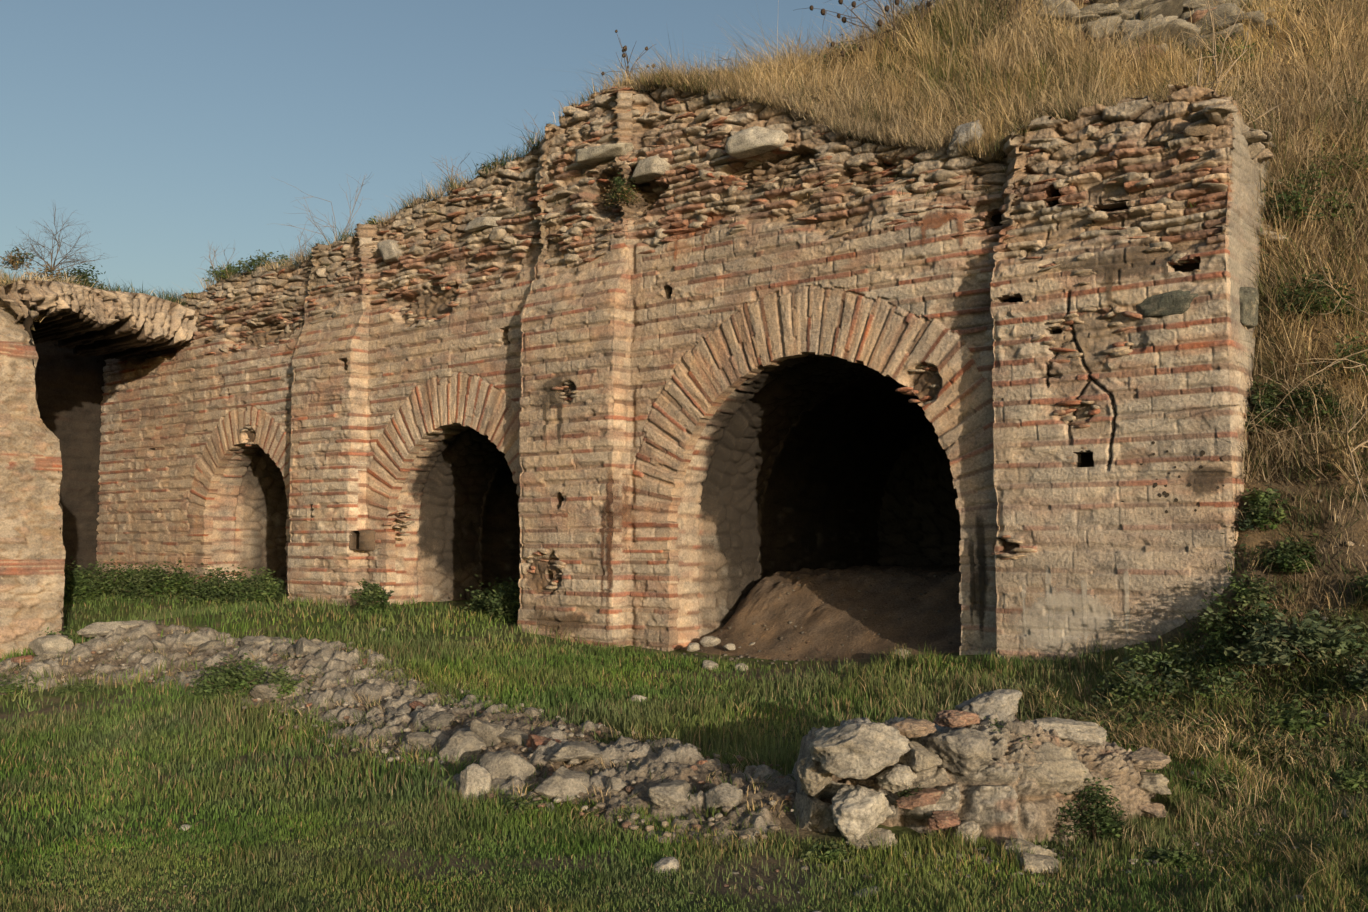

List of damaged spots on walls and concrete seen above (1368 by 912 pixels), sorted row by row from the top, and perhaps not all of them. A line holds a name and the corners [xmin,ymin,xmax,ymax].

spalling [895,365,941,405]
crack [1040,292,1117,468]
water stain [968,517,988,629]